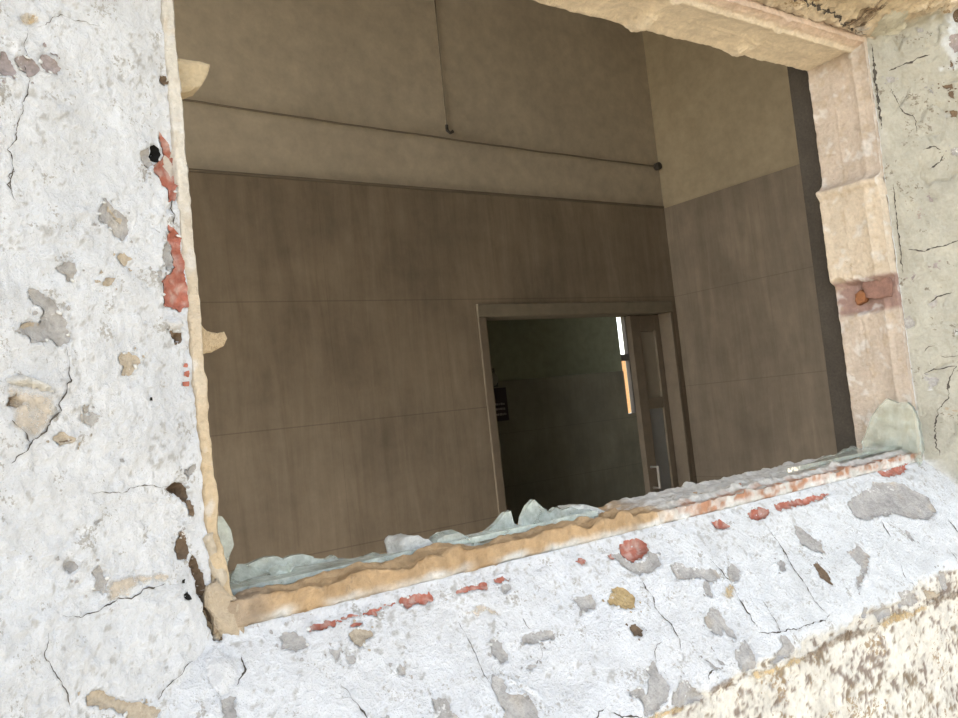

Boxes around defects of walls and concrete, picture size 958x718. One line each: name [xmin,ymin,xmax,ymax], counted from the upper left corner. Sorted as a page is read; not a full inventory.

crack [7,14,91,204]
crack [794,0,944,168]
flaking render [140,132,177,202]
flaking render [149,225,189,312]
crack [893,187,958,271]
peeling [16,288,71,347]
crack [12,348,72,463]
peeling [847,463,938,521]
crack [66,584,164,618]
peeling [608,538,757,679]
crack [710,530,828,634]
peeling [77,690,161,718]